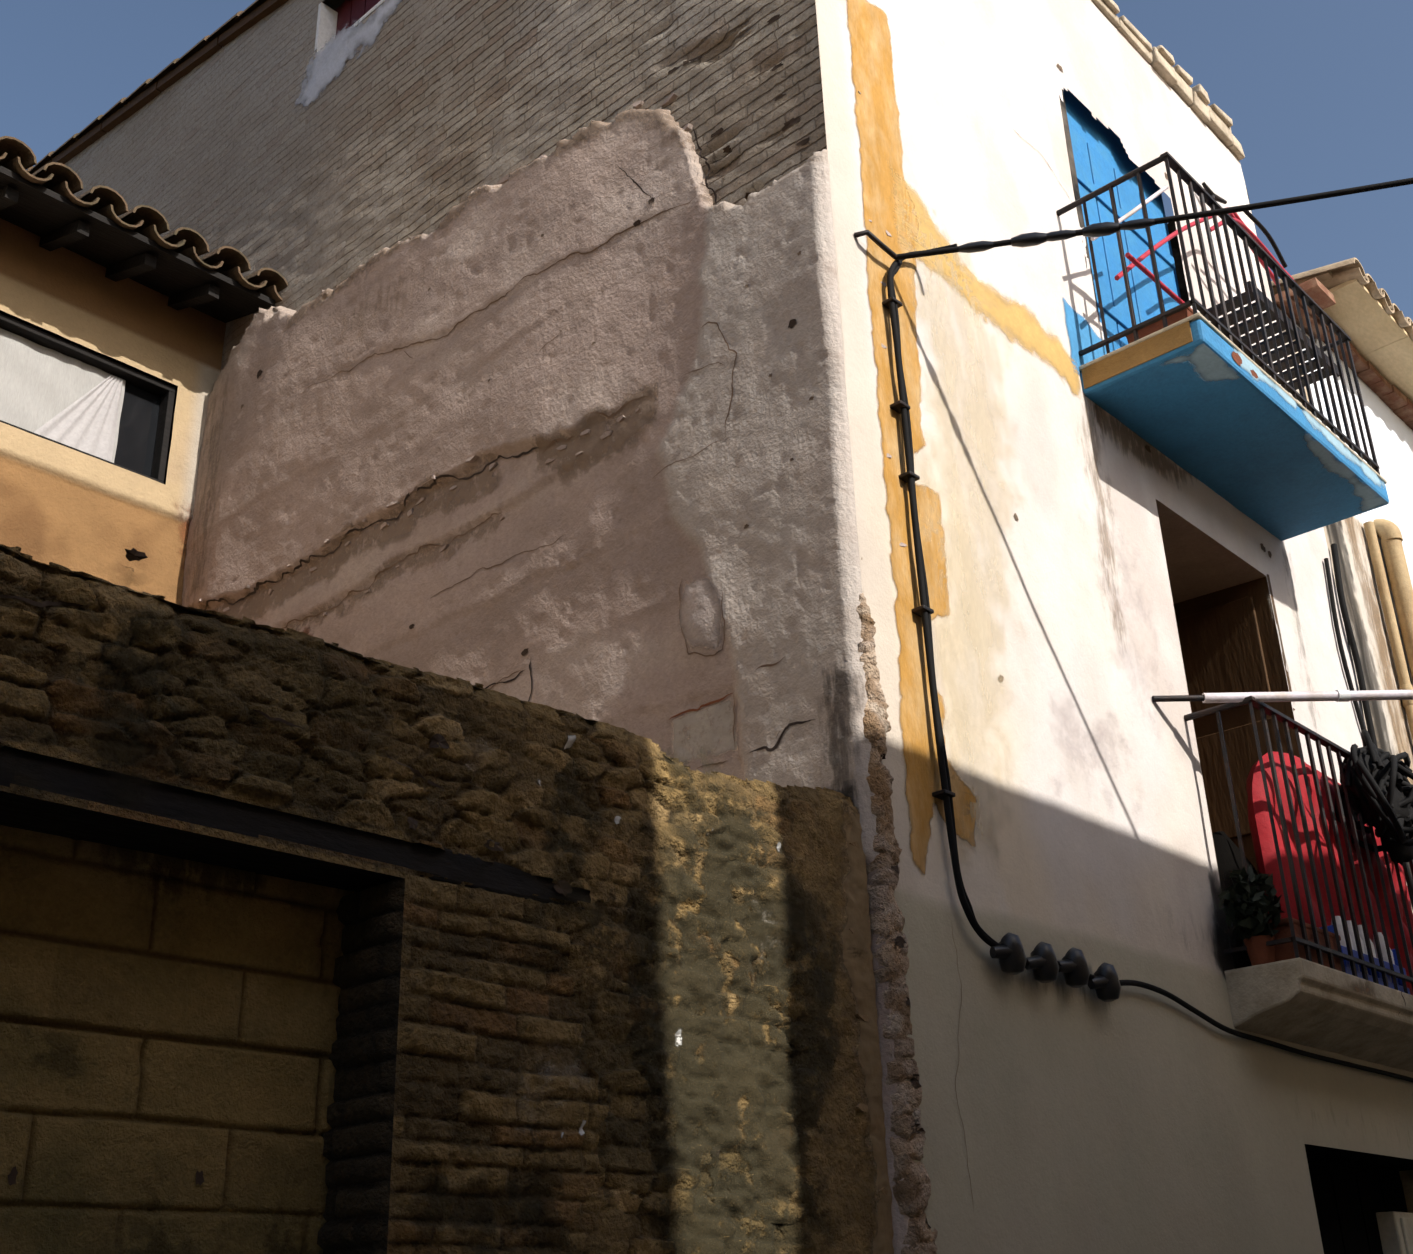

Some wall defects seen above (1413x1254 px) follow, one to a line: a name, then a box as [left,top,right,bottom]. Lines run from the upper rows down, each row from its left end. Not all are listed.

flaking render [438,93,731,228]
flaking render [289,234,421,326]
crack [298,165,691,395]
crack [654,321,737,477]
crack [430,535,563,599]
crack [486,661,532,701]
crack [697,719,815,769]
peeling [840,0,1080,1254]